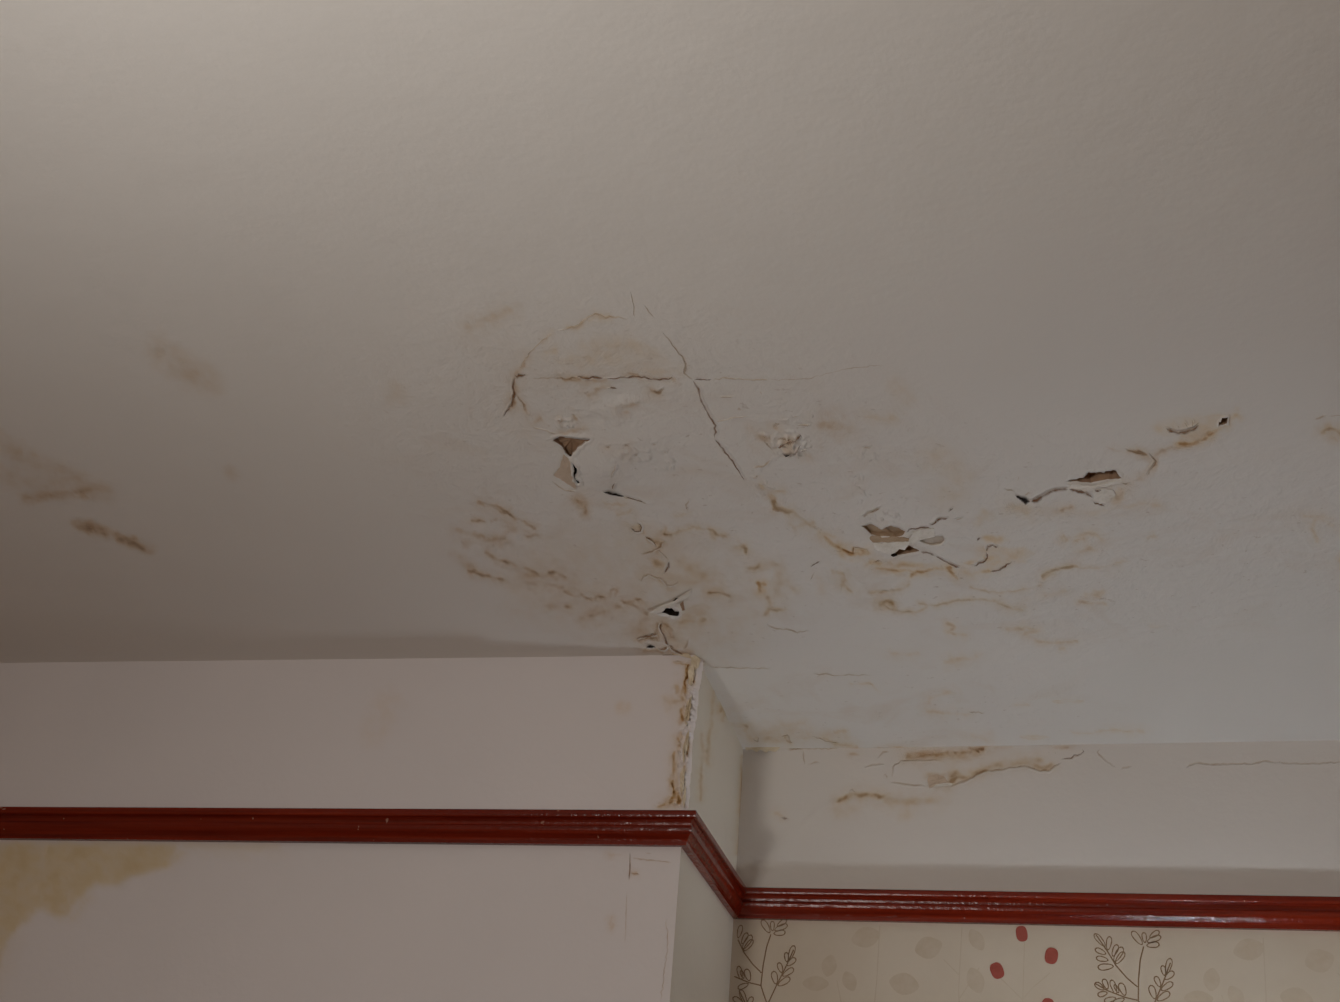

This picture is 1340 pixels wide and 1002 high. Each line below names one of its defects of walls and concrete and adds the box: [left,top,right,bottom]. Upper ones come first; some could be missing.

crack [502,292,769,481]
spalling [532,426,594,493]
spalling [1062,466,1124,504]
spalling [856,519,948,559]
spalling [649,590,692,621]